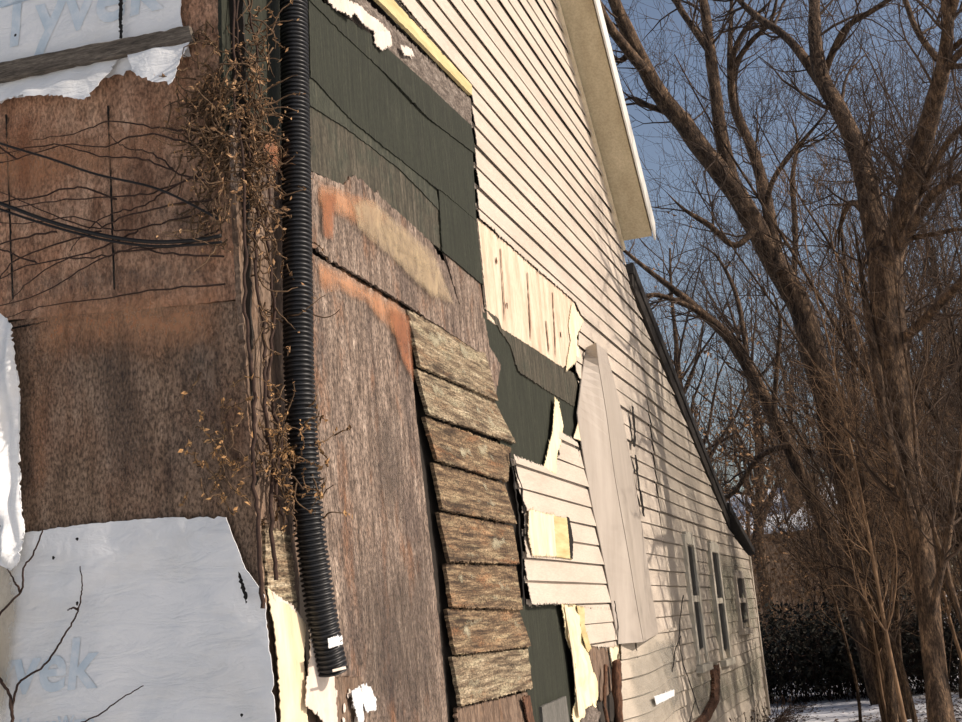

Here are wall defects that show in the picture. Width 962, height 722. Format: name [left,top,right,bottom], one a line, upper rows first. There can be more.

peeling [328,0,415,60]
peeling [476,218,584,372]
peeling [526,507,573,560]
peeling [335,683,377,722]